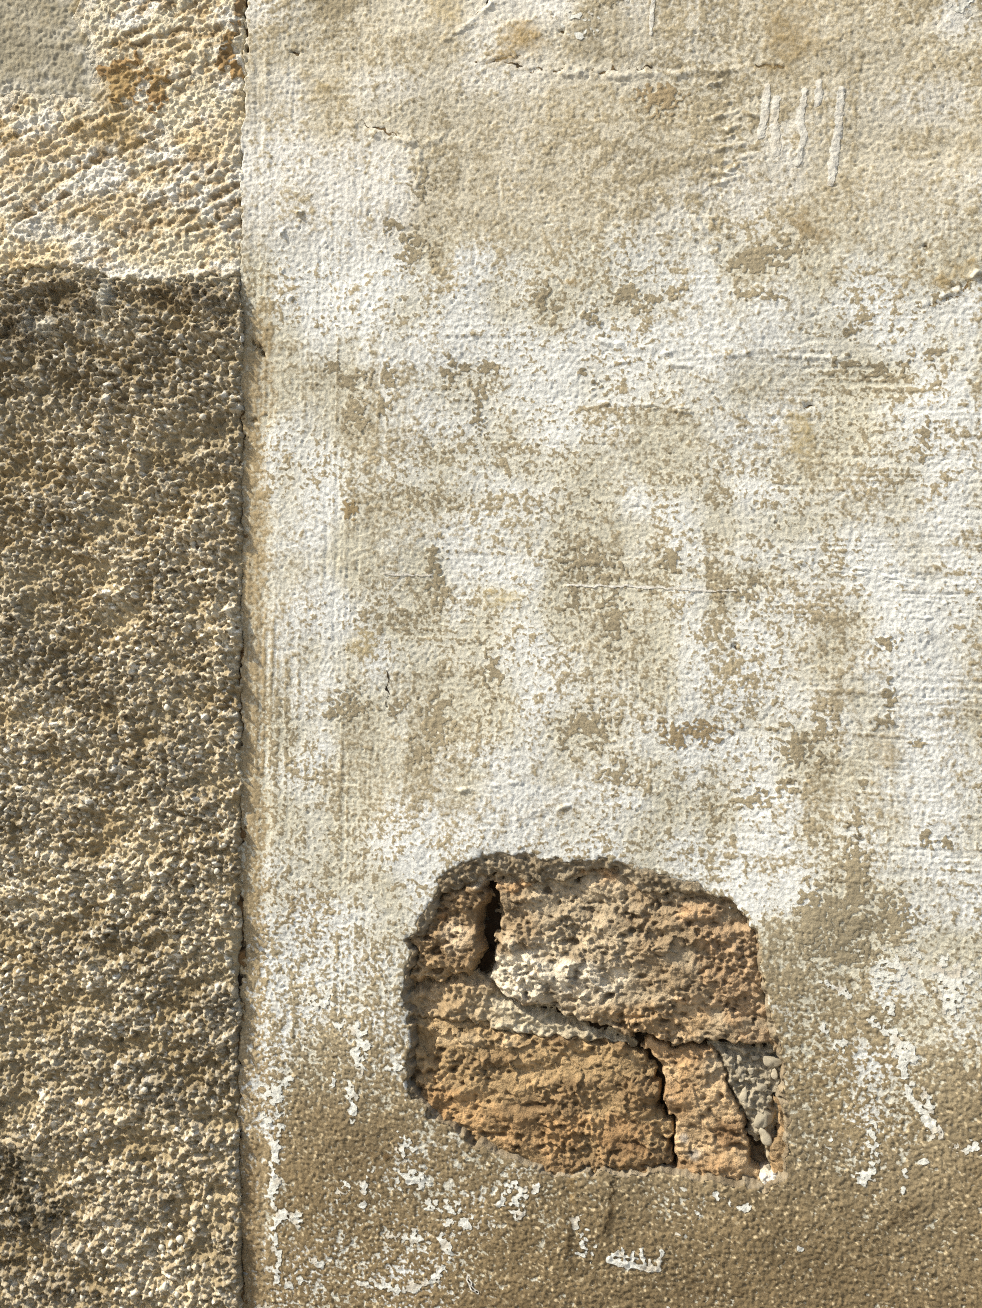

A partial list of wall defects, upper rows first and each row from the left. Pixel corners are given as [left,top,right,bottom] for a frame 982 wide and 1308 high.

crack [477,879,501,972]
spalling [288,851,792,1221]
crack [541,1006,677,1160]
crack [703,1039,767,1047]
peeling [357,1130,495,1295]
peeling [569,1215,597,1264]